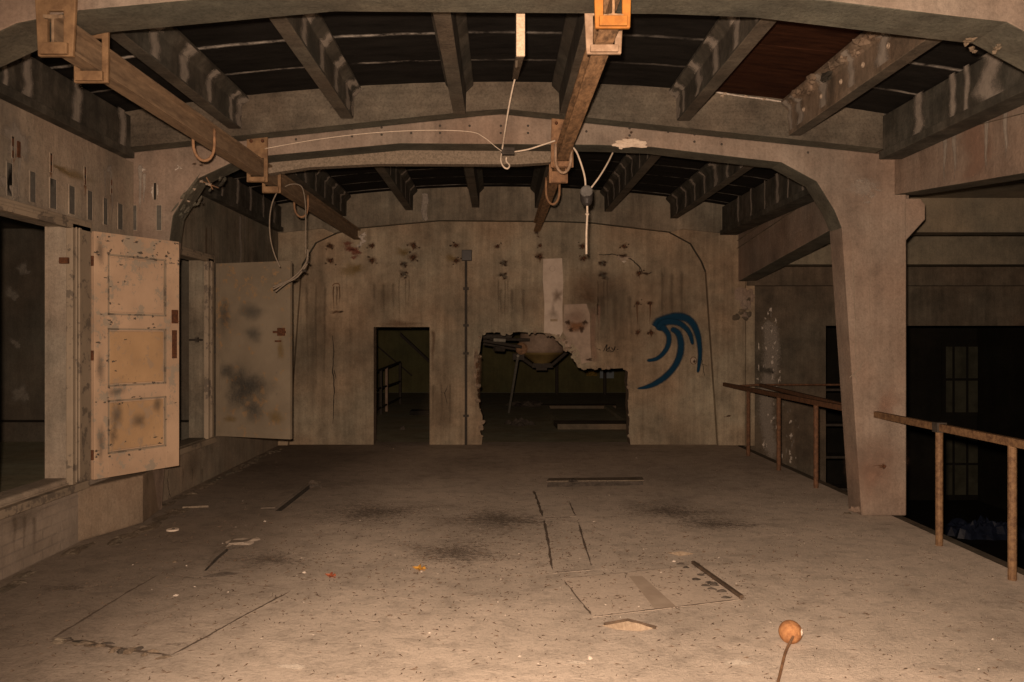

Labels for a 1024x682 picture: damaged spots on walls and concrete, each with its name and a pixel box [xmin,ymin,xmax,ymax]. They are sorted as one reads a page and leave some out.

spalling [790,31,890,112]
spalling [527,328,633,438]